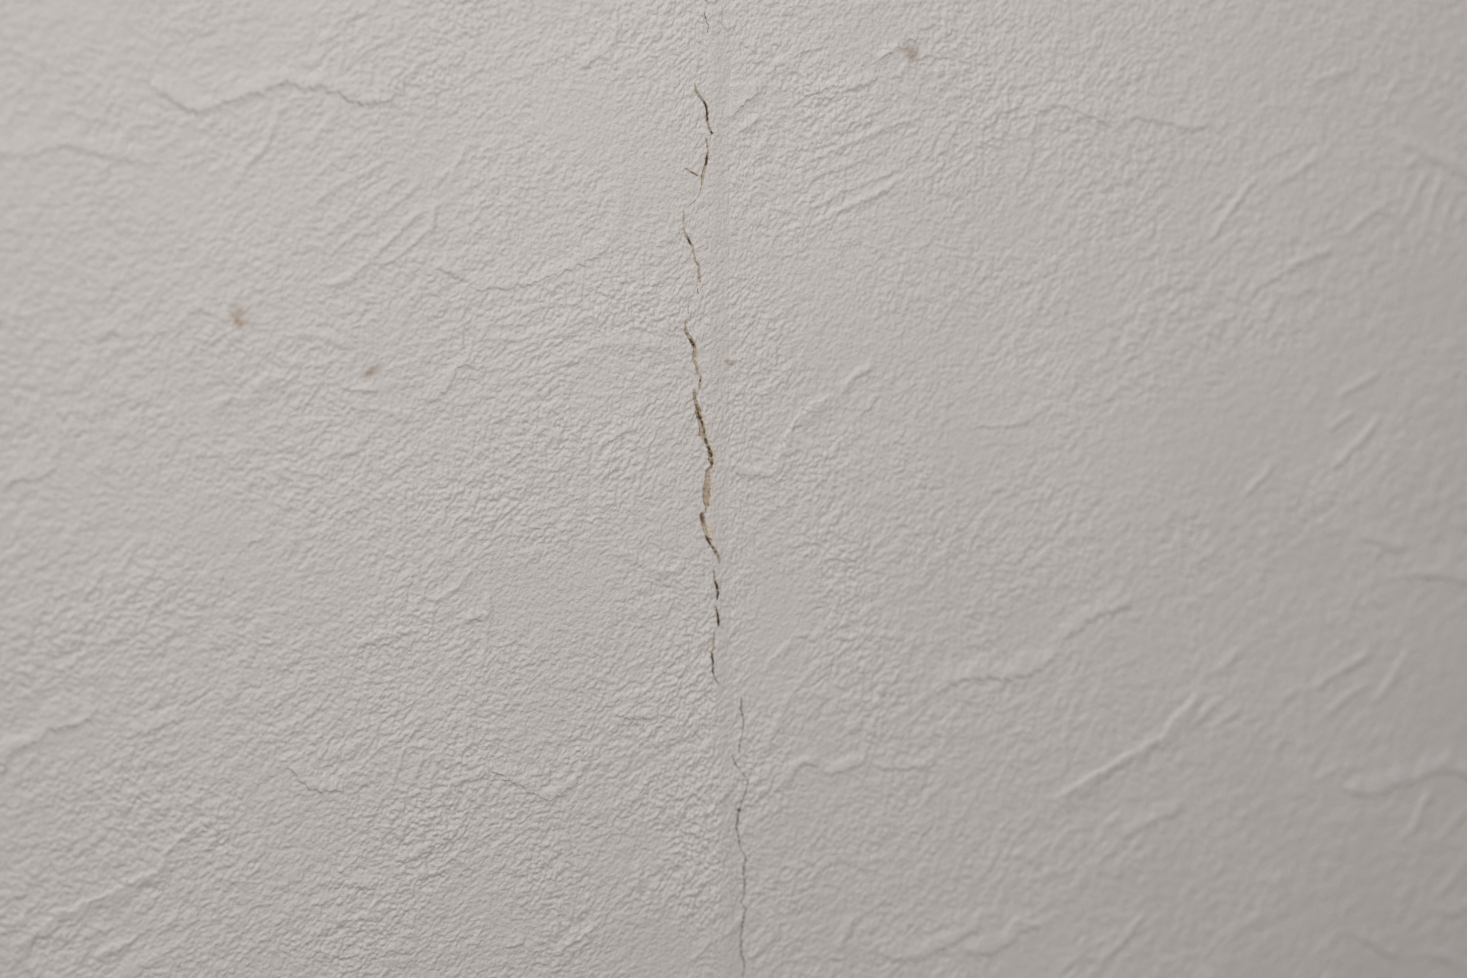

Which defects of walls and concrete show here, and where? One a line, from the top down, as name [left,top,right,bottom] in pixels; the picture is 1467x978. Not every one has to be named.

crack [683,86,748,977]